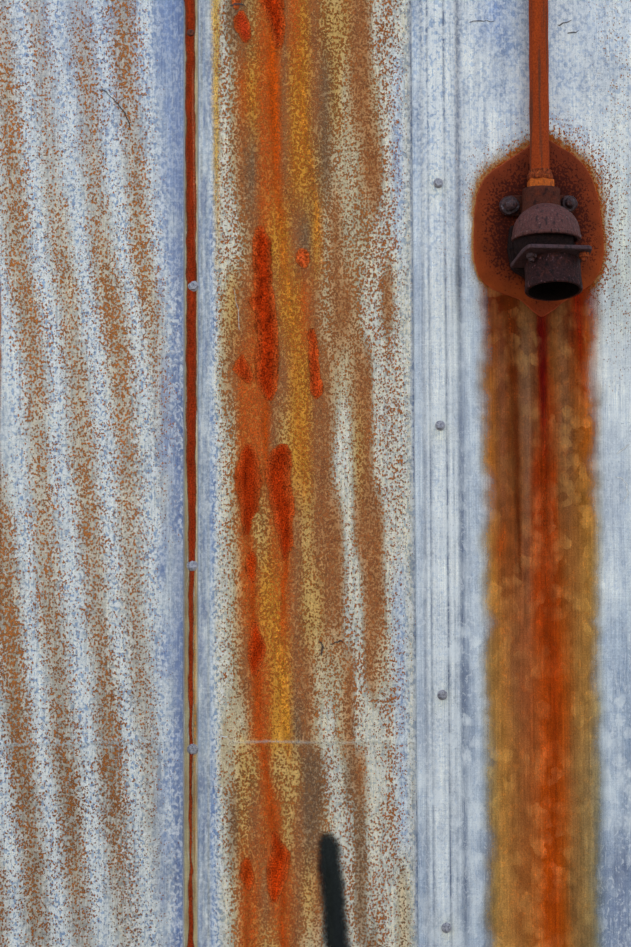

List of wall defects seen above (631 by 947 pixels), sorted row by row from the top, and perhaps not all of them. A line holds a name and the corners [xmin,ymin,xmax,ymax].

corrosion [0,0,197,947]
corrosion [211,0,417,947]
corrosion [439,0,631,947]